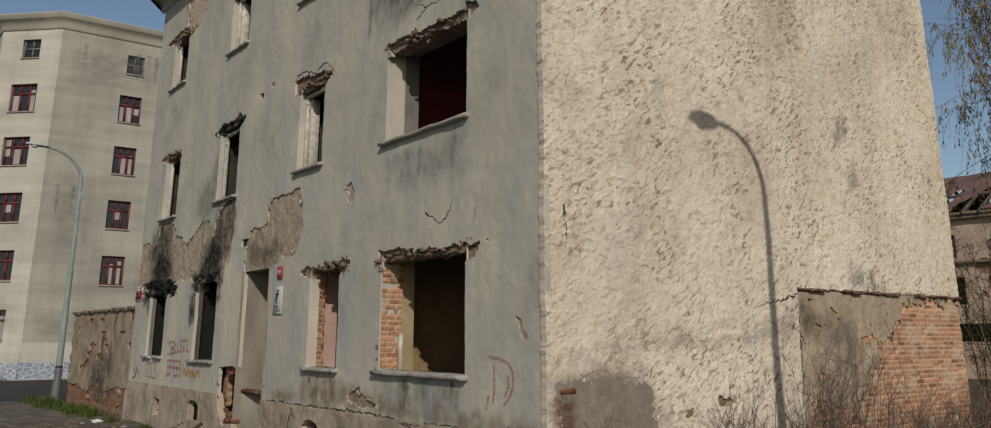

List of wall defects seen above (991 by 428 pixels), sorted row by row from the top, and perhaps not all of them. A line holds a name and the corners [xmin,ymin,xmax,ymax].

peeling [134,198,236,297]
peeling [244,188,304,275]
crack [425,198,476,223]
flaking render [66,319,125,417]
peeling [349,387,376,409]
flaking render [797,287,978,428]